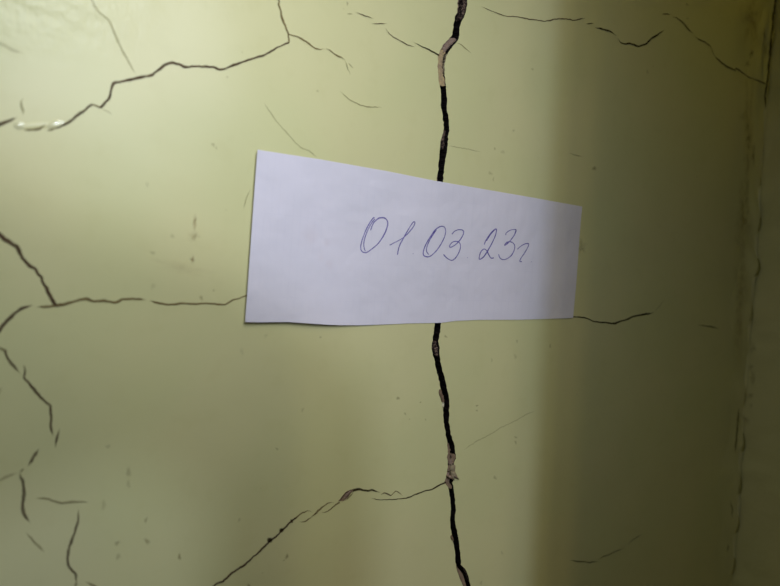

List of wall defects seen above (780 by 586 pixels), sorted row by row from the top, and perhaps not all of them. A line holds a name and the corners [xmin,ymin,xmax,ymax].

crack [0,0,348,131]
crack [359,0,776,182]
crack [0,232,247,445]
crack [20,452,37,520]
crack [67,513,95,586]
crack [213,323,470,586]